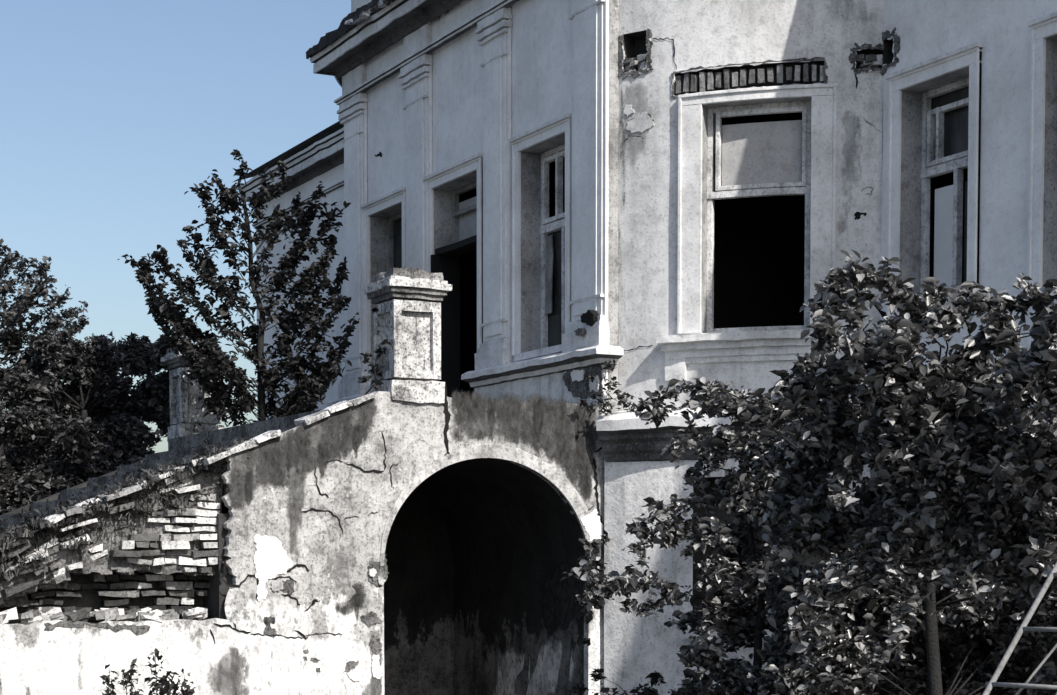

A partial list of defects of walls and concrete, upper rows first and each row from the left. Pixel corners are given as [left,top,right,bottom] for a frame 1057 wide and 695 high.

hole [618,28,653,80]
flaking render [671,57,828,99]
spalling [848,27,901,75]
damp [228,399,376,553]
crack [302,432,399,532]
crack [442,384,451,456]
damp [452,392,598,500]
crack [210,560,343,642]
flaking render [270,579,295,595]
damp [211,599,330,695]
damp [363,631,382,695]